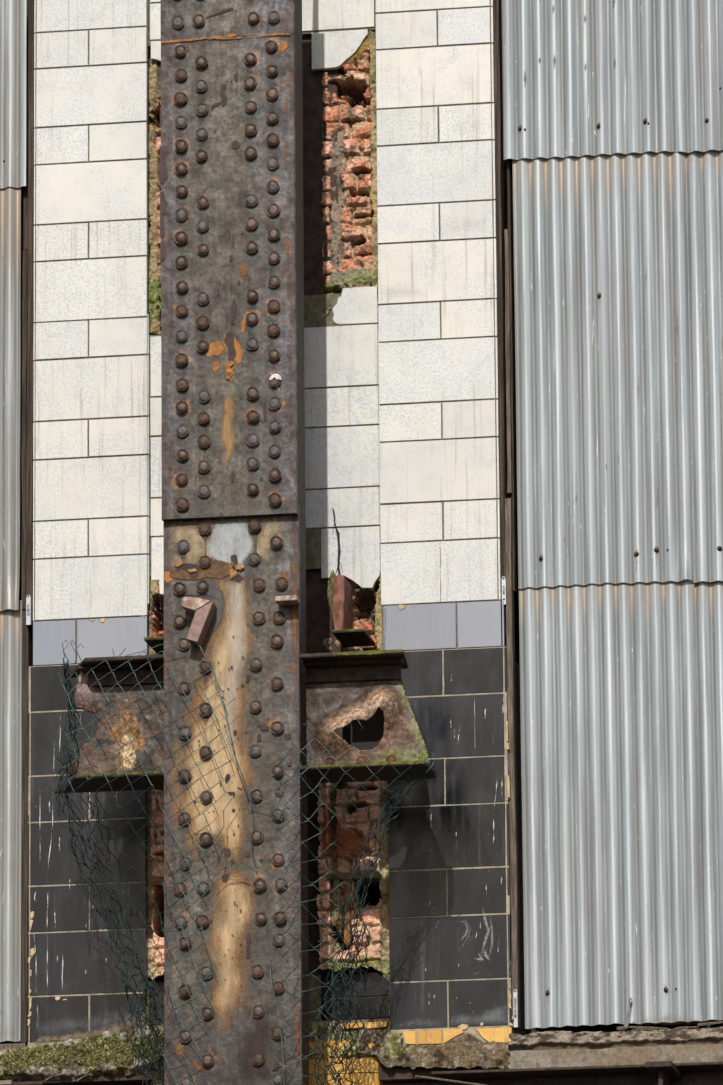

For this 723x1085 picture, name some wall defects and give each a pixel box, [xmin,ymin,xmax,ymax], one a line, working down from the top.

rust [161,33,290,52]
spalling [148,58,168,334]
spalling [321,30,378,317]
rust [206,311,249,381]
rust [222,397,234,461]
rust [282,563,298,671]
spalling [323,571,382,652]
spalling [147,789,164,980]
rust [175,580,251,1019]
spalling [317,780,390,978]